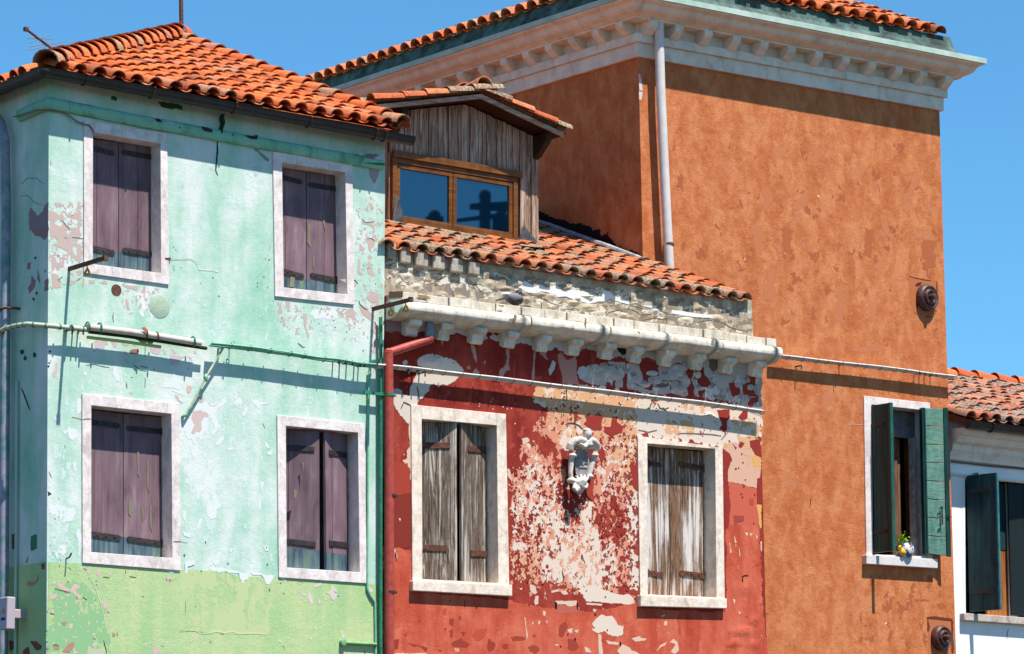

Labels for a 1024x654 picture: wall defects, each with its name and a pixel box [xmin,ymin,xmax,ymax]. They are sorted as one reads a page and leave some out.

peeling [27,202,107,294]
peeling [121,283,159,317]
peeling [273,197,752,372]
peeling [150,347,269,451]
flaking render [393,353,464,480]
peeling [507,353,763,654]
peeling [163,546,356,611]